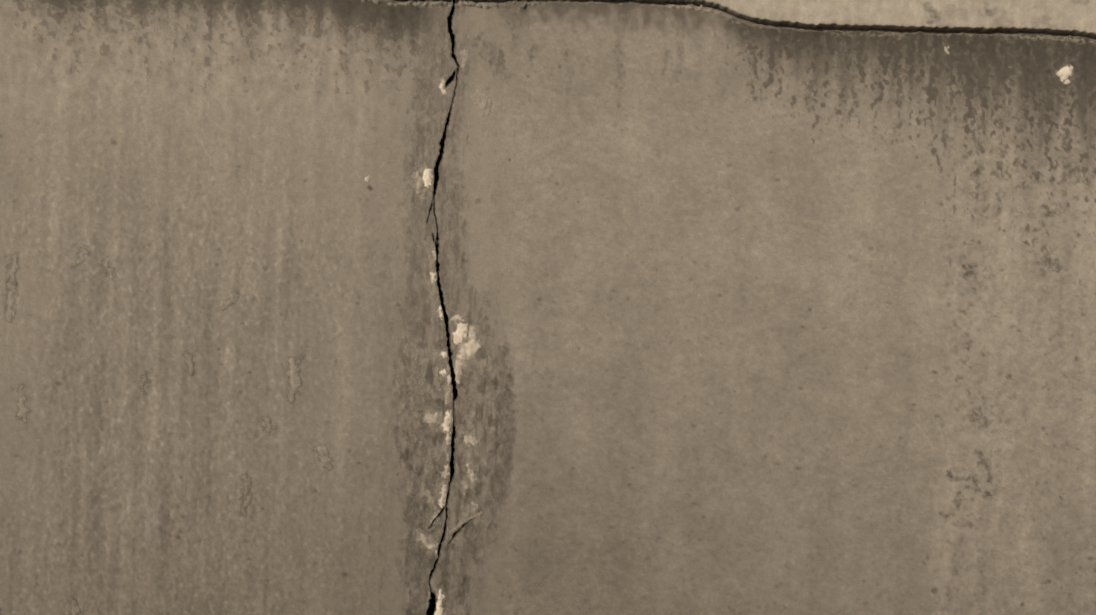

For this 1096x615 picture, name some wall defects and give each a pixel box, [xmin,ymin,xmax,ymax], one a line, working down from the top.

water stain [501,1,706,27]
water stain [720,13,1096,235]
crack [403,0,492,615]